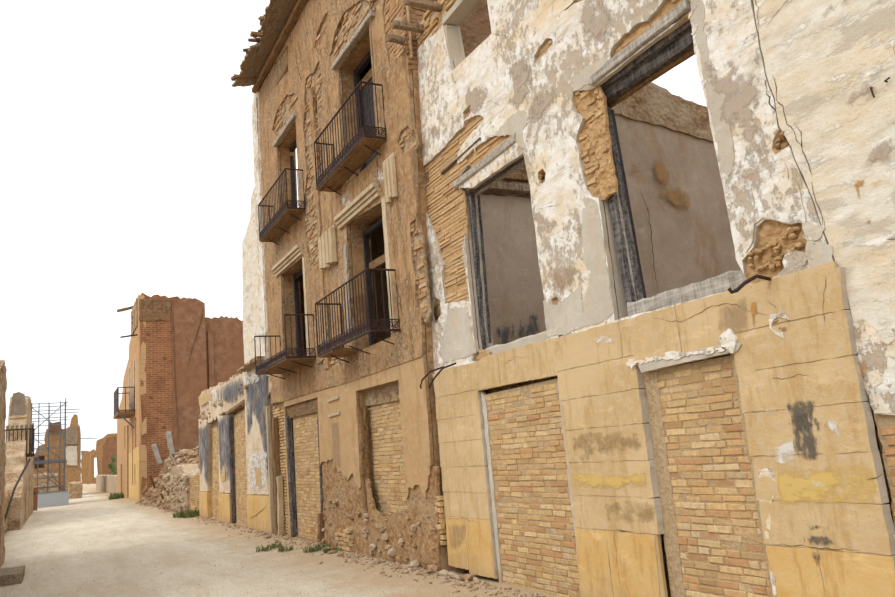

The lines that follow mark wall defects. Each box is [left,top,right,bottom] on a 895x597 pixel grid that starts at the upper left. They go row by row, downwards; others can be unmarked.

flaking render [411,39,556,364]
spalling [498,0,793,344]
spalling [746,220,834,285]
crack [765,75,825,227]
peeling [198,372,268,489]